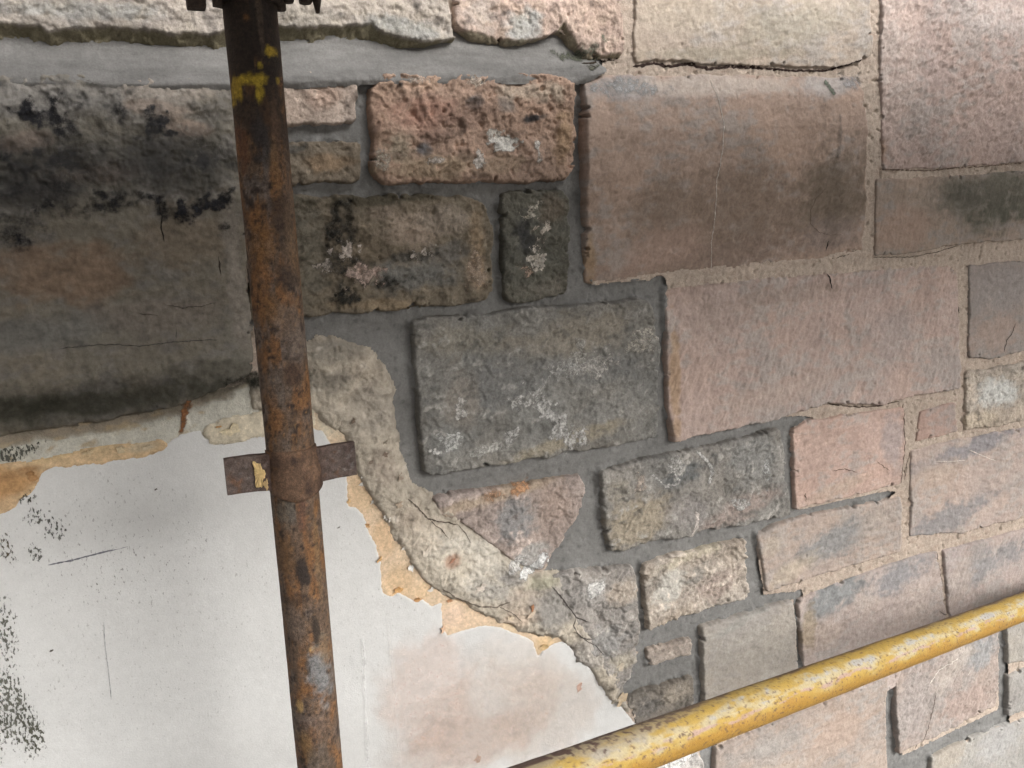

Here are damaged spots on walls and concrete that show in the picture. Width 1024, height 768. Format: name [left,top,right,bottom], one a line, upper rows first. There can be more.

rust [179,400,192,433]
peeling [202,376,265,445]
peeling [0,439,168,514]
crack [408,499,470,541]
flaking render [306,334,630,713]
crack [552,587,603,654]
damp [0,597,46,759]